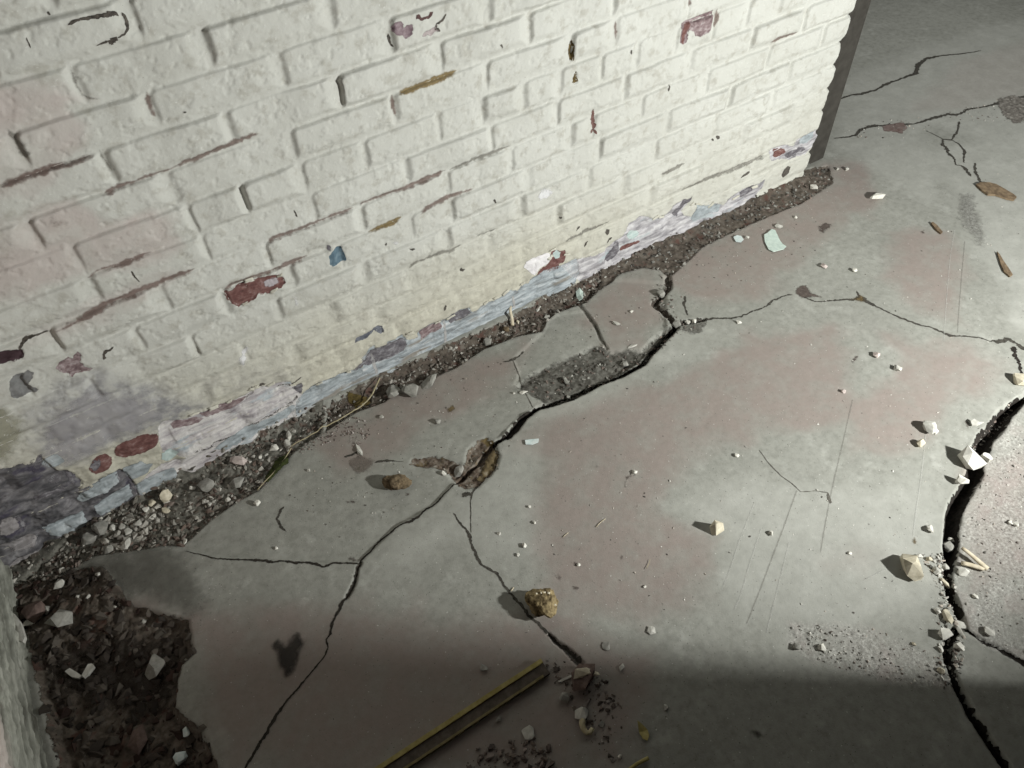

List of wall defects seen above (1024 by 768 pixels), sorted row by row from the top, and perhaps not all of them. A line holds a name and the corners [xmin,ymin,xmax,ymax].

peeling [391,21,436,39]
peeling [680,10,713,45]
crack [841,50,981,99]
peeling [769,130,817,177]
crack [839,96,1024,182]
peeling [764,229,786,252]
flaking render [0,171,765,567]
crack [195,377,301,453]
crack [344,451,403,463]
crack [493,280,1024,768]
crack [187,481,582,768]
spalling [65,663,95,679]